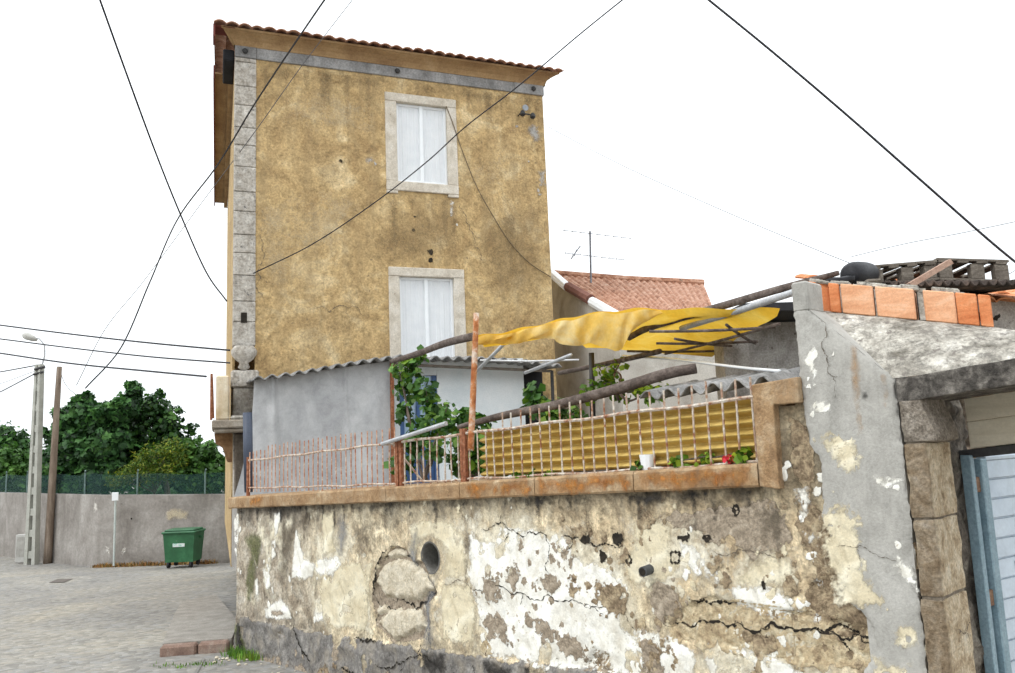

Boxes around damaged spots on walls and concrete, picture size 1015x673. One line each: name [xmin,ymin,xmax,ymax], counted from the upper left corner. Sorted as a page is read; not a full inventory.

peeling [804,347,818,388]
peeling [246,401,907,673]
peeling [893,541,919,592]
crack [341,514,633,673]
water stain [422,654,446,673]
water stain [483,662,509,673]
crack [665,598,869,651]
peeling [896,626,926,650]